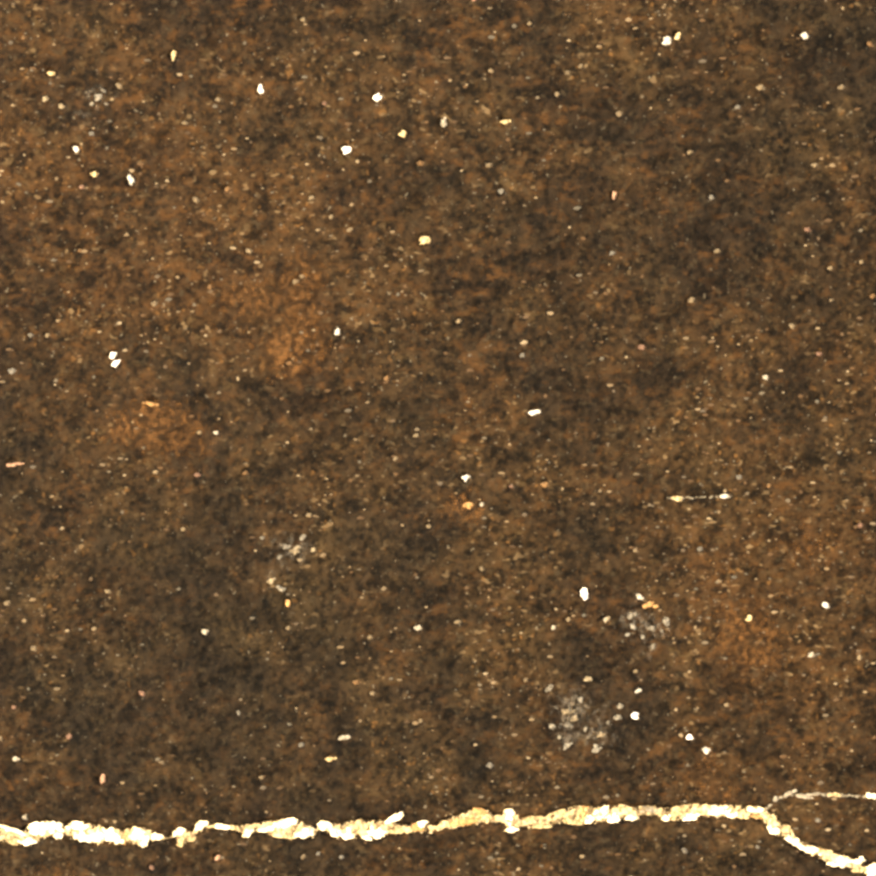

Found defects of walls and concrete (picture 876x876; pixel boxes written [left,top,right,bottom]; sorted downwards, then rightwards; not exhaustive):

crack [0,789,876,876]